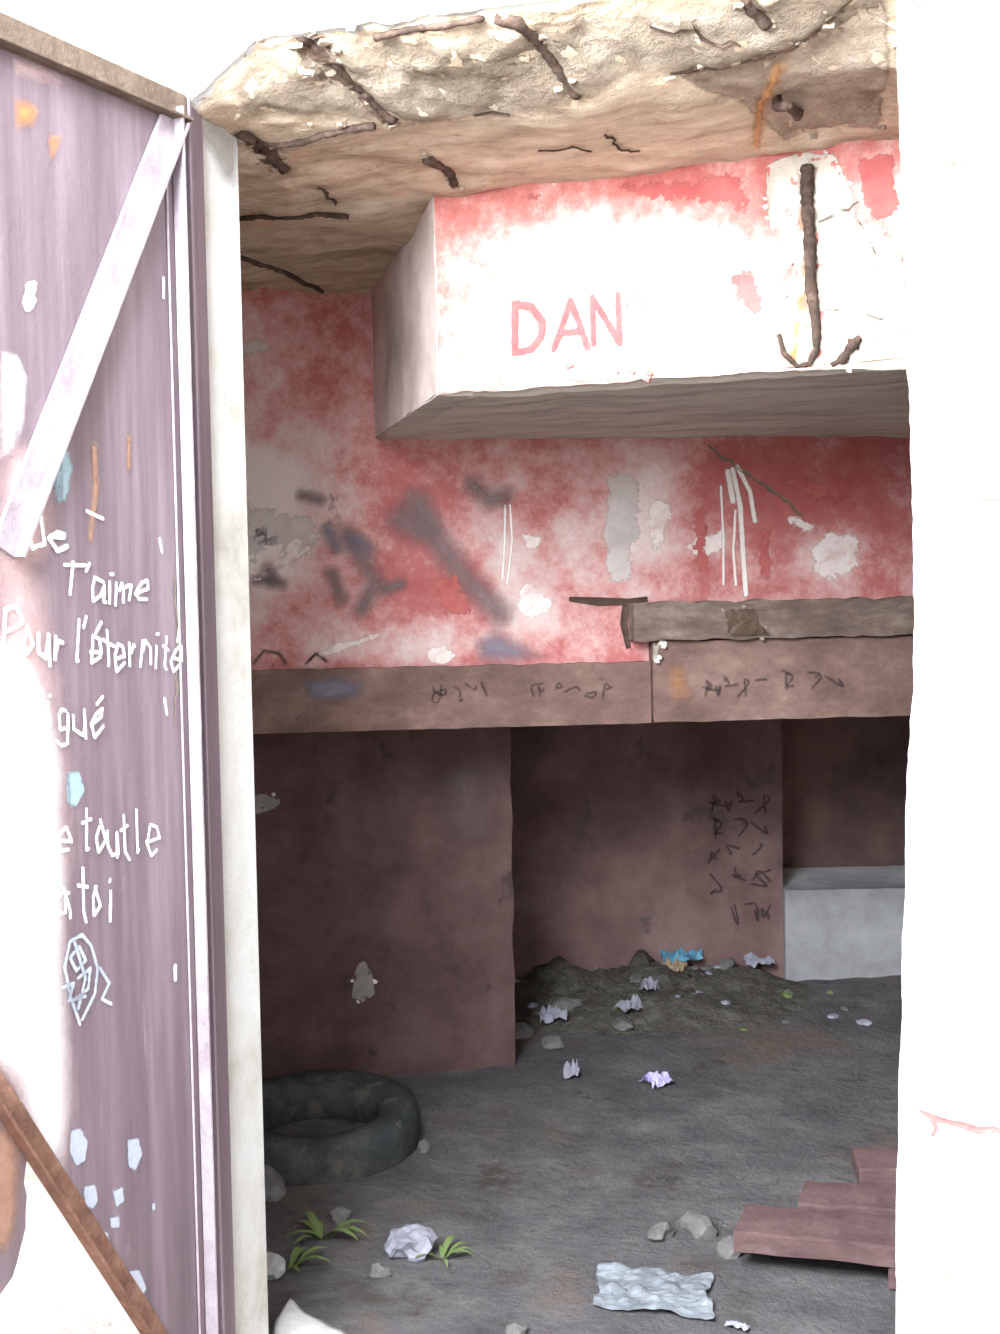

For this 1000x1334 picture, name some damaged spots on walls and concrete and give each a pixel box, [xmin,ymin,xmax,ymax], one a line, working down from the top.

spalling [234,0,907,373]
corrosion [790,260,810,360]
peeling [247,501,320,590]
peeling [603,473,673,582]
peeling [787,516,859,582]
spalling [254,792,281,814]
spalling [350,961,378,1004]
crack [918,1109,1000,1137]